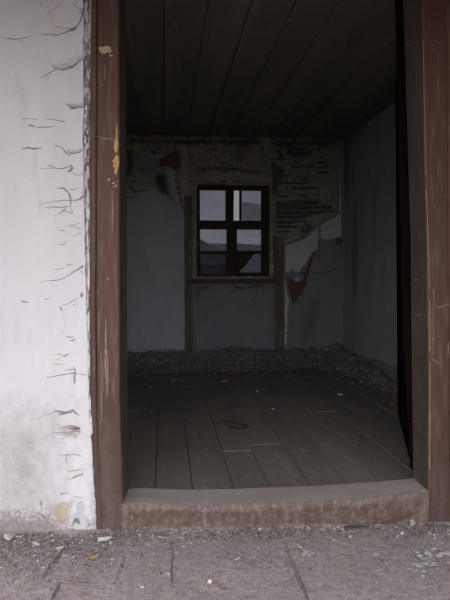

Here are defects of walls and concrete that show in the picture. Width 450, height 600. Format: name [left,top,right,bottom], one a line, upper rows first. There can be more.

crack [3,2,84,43]
crack [22,143,84,245]
spalling [98,126,342,348]
crack [40,264,84,283]
crack [47,336,87,384]
crack [33,409,80,440]
spalling [72,501,88,530]